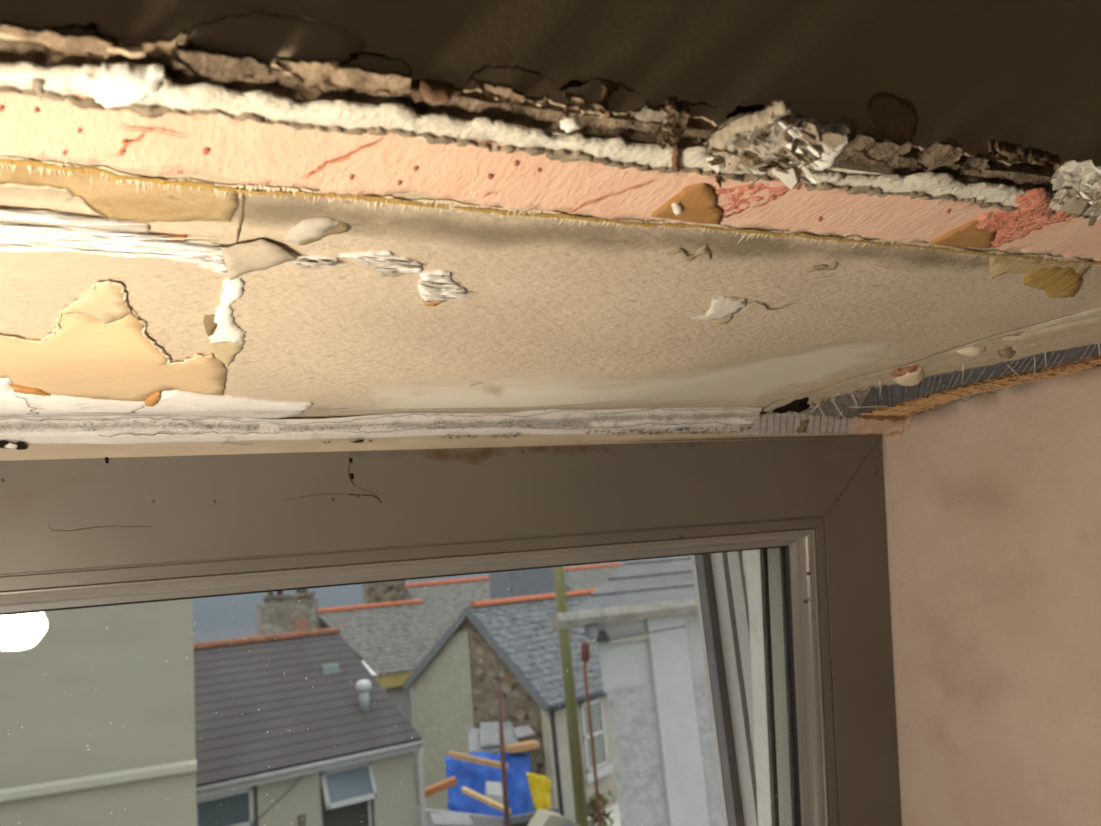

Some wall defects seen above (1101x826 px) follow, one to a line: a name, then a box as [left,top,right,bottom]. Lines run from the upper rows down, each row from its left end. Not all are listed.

spalling [0,21,721,154]
spalling [651,128,803,225]
spalling [836,91,1091,298]
peeling [0,378,312,419]